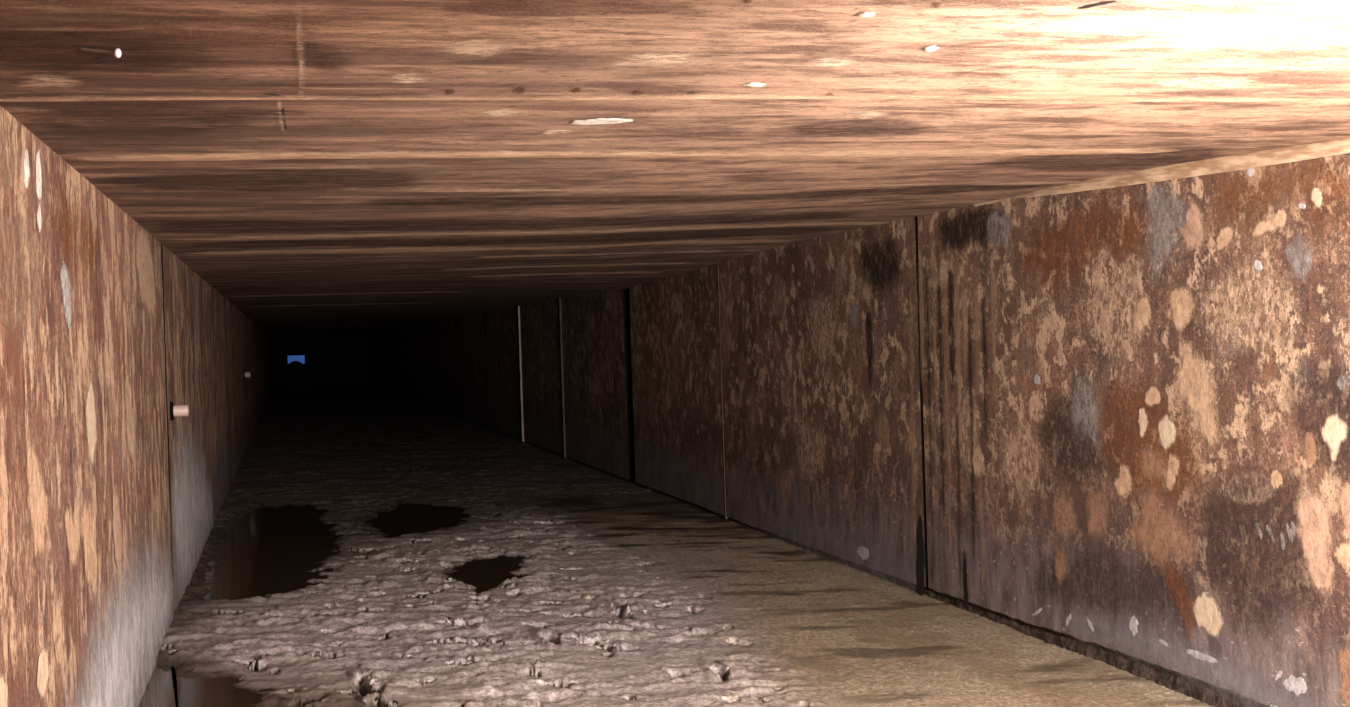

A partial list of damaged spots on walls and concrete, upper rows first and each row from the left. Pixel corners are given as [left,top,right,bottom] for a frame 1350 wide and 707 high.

rust [1107,390,1193,494]
rust [1339,648,1350,707]